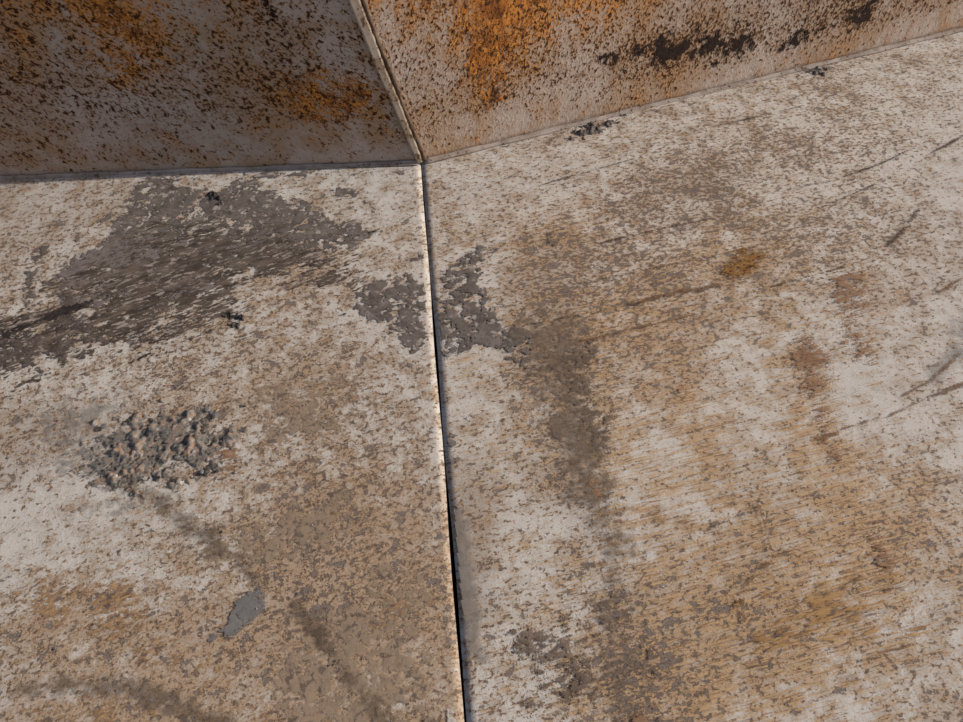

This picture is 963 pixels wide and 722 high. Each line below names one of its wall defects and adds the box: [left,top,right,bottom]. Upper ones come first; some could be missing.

corrosion [38,0,171,97]
corrosion [260,0,289,50]
corrosion [268,62,390,131]
corrosion [398,0,552,112]
corrosion [599,20,756,76]
corrosion [778,0,884,67]
corrosion [779,262,883,471]
water stain [59,397,224,514]
corrosion [714,517,930,678]